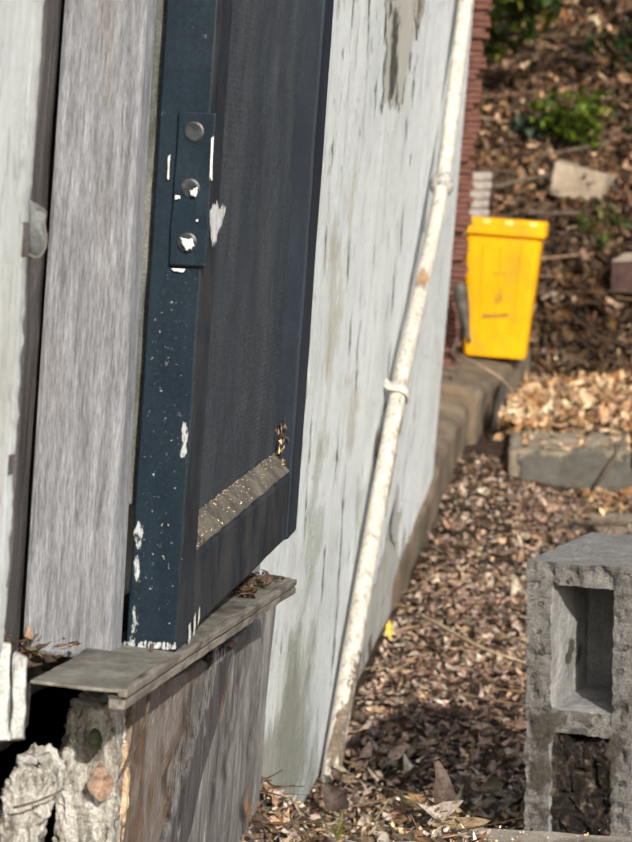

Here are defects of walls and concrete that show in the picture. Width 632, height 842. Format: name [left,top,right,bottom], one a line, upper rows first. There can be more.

peeling [372,0,437,116]